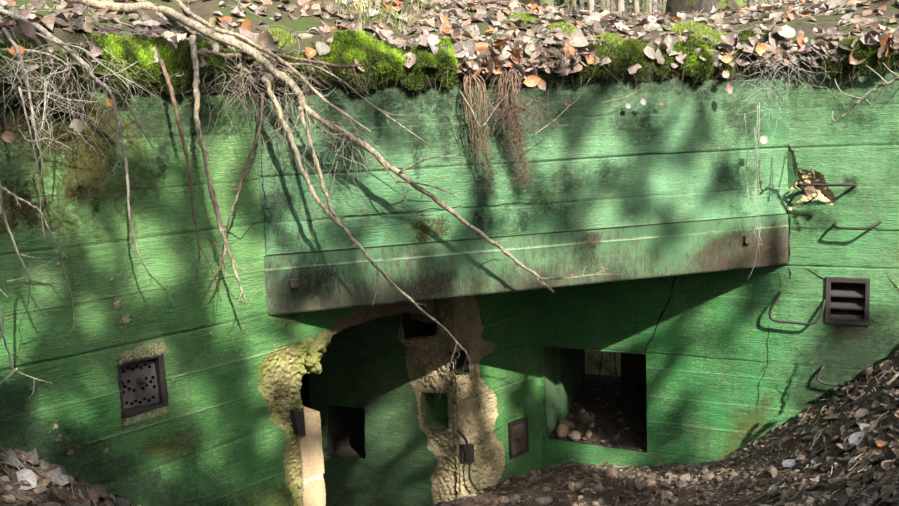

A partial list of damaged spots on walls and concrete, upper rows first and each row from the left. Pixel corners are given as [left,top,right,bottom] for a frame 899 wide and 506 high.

crack [645,277,677,354]
spalling [258,295,505,506]
crack [756,328,769,413]